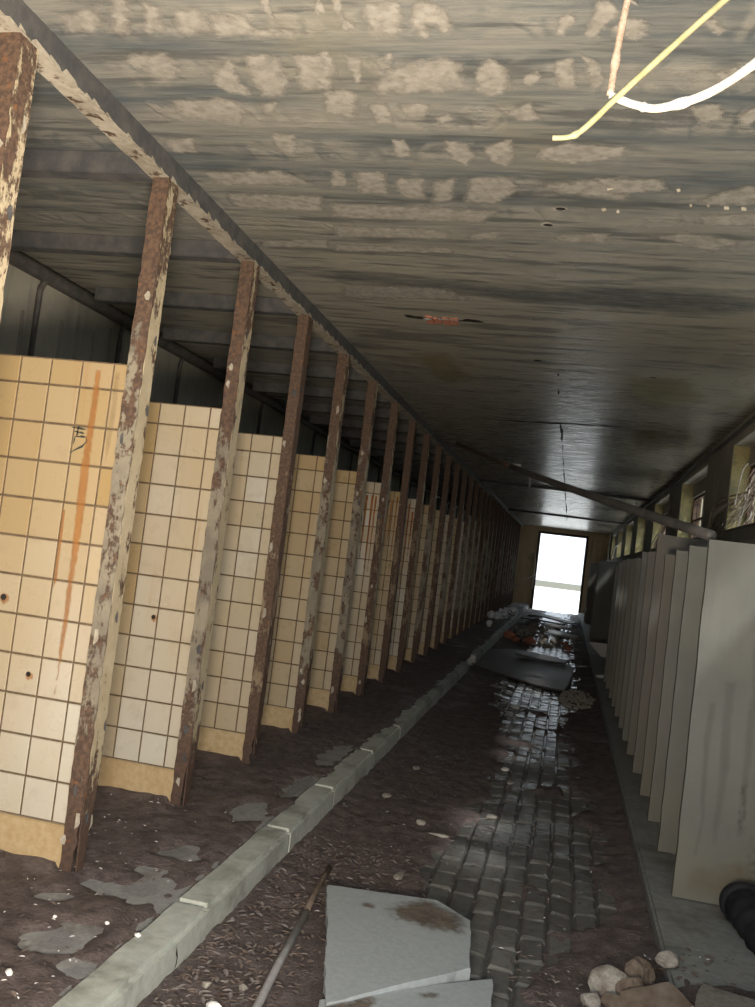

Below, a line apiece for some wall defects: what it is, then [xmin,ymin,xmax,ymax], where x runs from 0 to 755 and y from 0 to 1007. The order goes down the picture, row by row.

peeling [59,0,130,35]
peeling [174,0,301,38]
peeling [362,2,452,38]
peeling [585,1,646,40]
peeling [172,52,511,124]
peeling [539,143,626,164]
peeling [0,14,393,399]
peeling [203,139,517,253]
peeling [545,177,681,213]
corrosion [54,511,65,584]
corrosion [59,372,99,659]
corrosion [356,483,414,588]